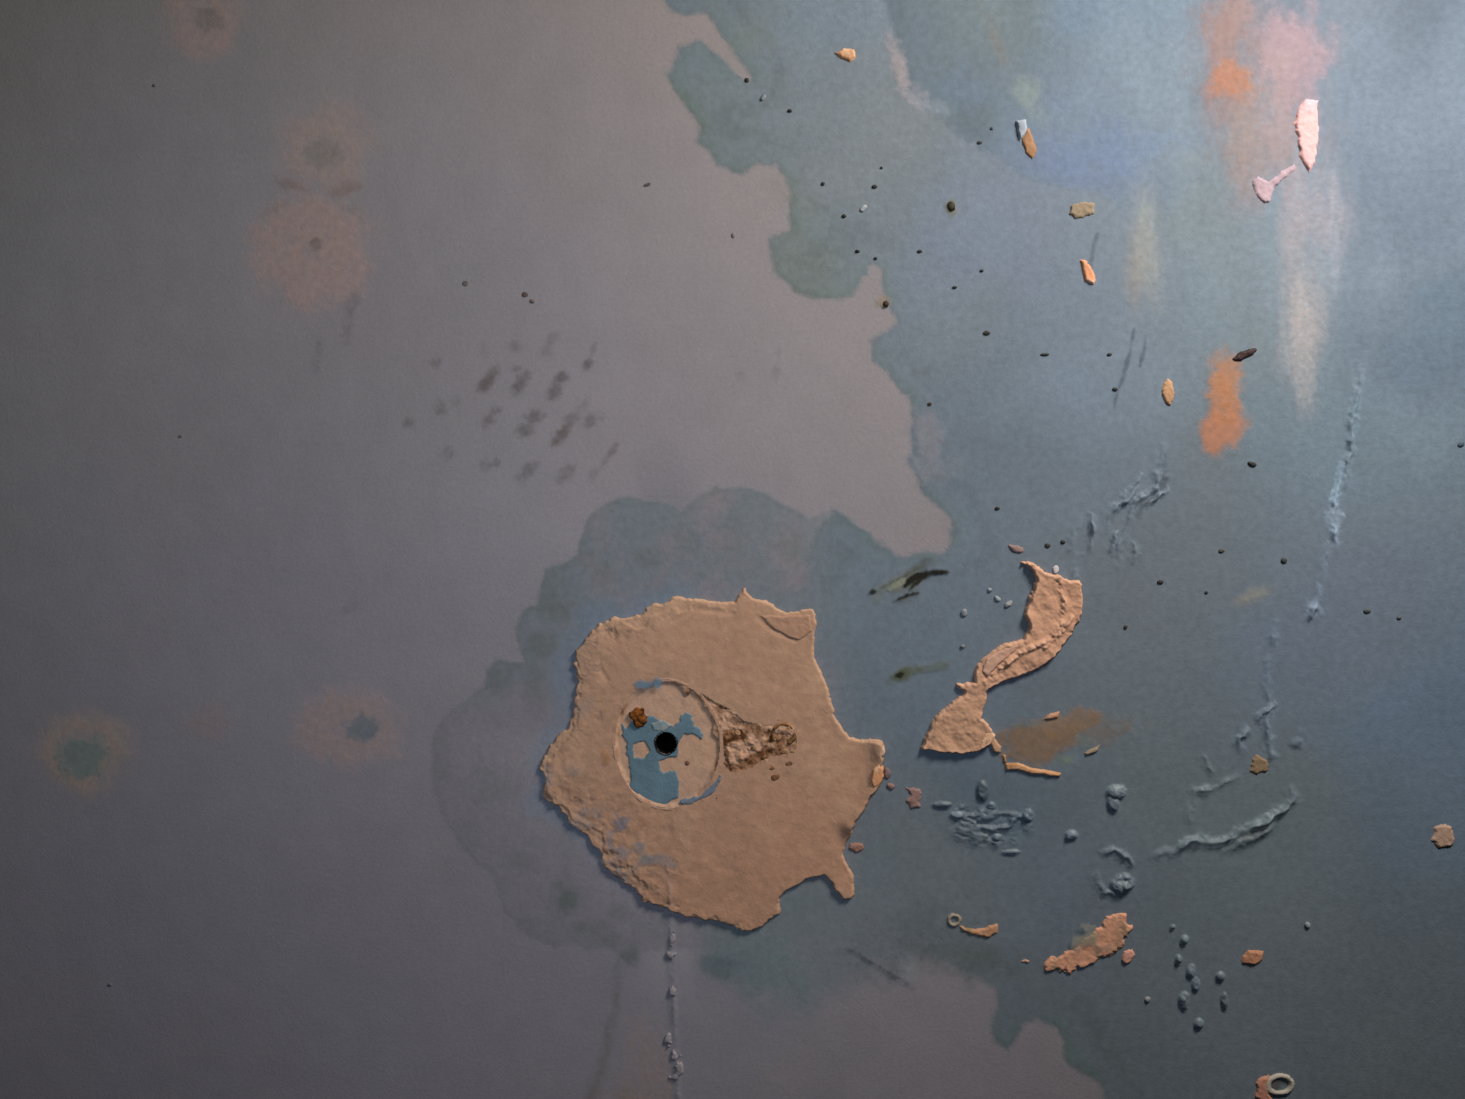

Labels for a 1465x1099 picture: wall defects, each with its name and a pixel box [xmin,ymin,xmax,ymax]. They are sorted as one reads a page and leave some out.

peeling [1252,99,1319,203]
rust [1203,360,1241,452]
leakage [437,0,1465,1099]
spalling [893,663,945,680]
peeling [921,544,1100,777]
peeling [539,588,922,959]
peeling [1021,913,1135,975]